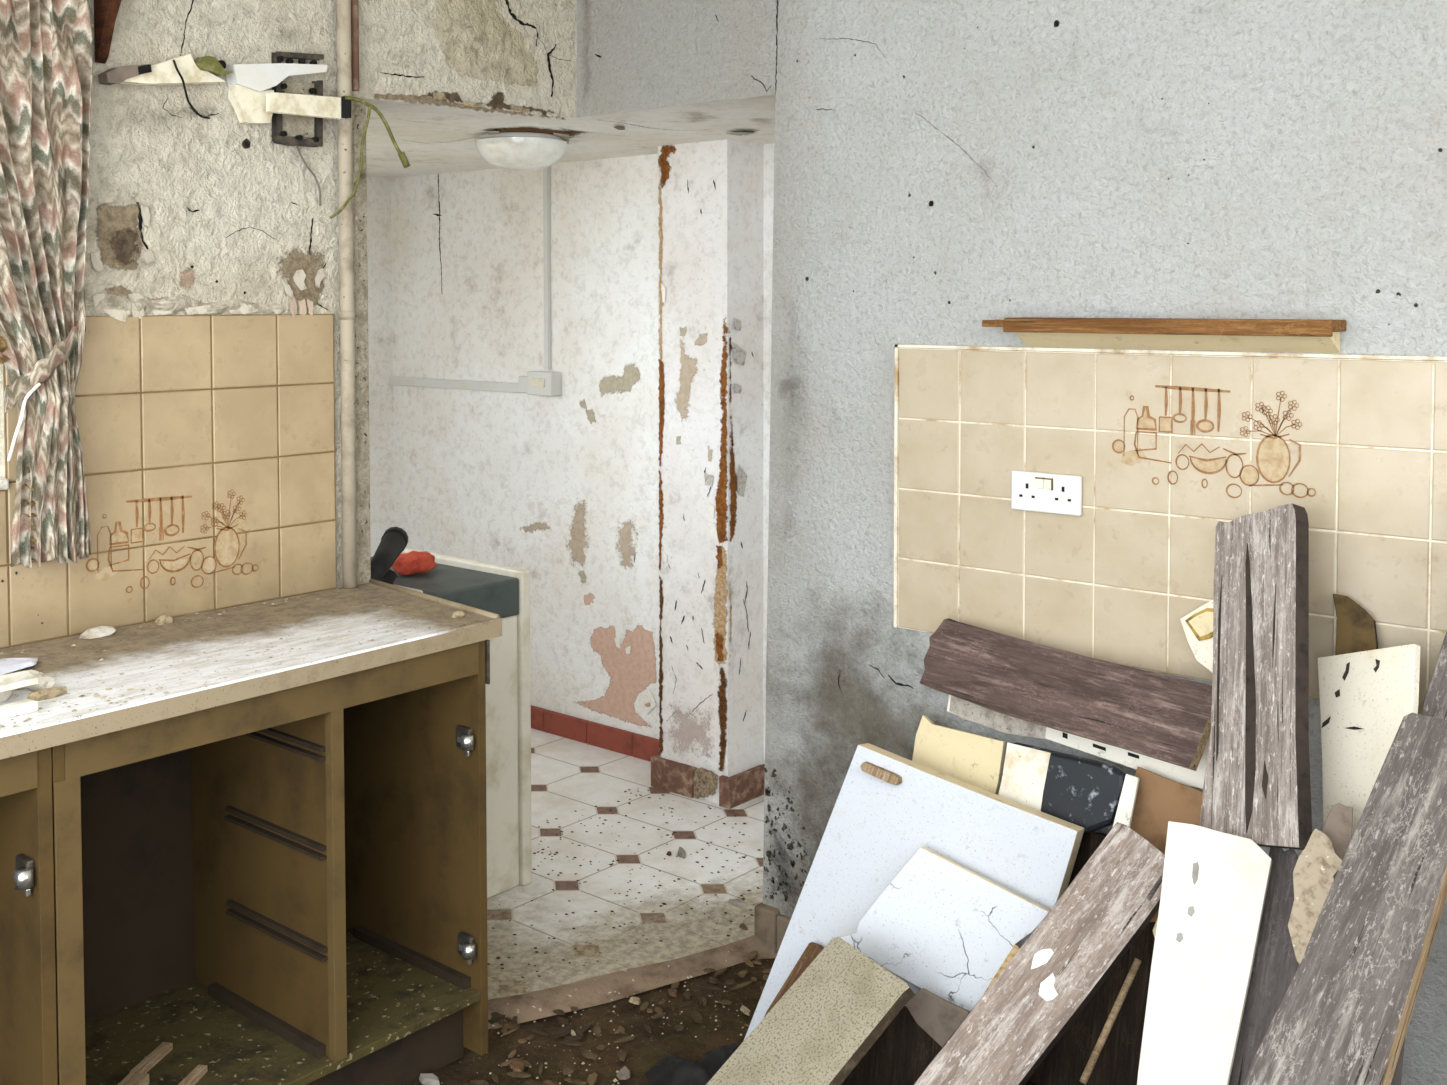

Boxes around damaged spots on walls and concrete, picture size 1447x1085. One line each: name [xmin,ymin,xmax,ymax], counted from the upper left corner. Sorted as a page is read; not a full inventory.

crack [180,0,194,56]
crack [505,0,667,134]
crack [751,0,778,92]
crack [709,128,758,136]
peeling [90,197,328,322]
peeling [599,364,640,396]
peeling [675,327,707,444]
rust [658,145,676,756]
peeling [616,521,638,569]
rust [704,318,747,772]
peeling [575,623,718,799]
water stain [763,634,938,912]